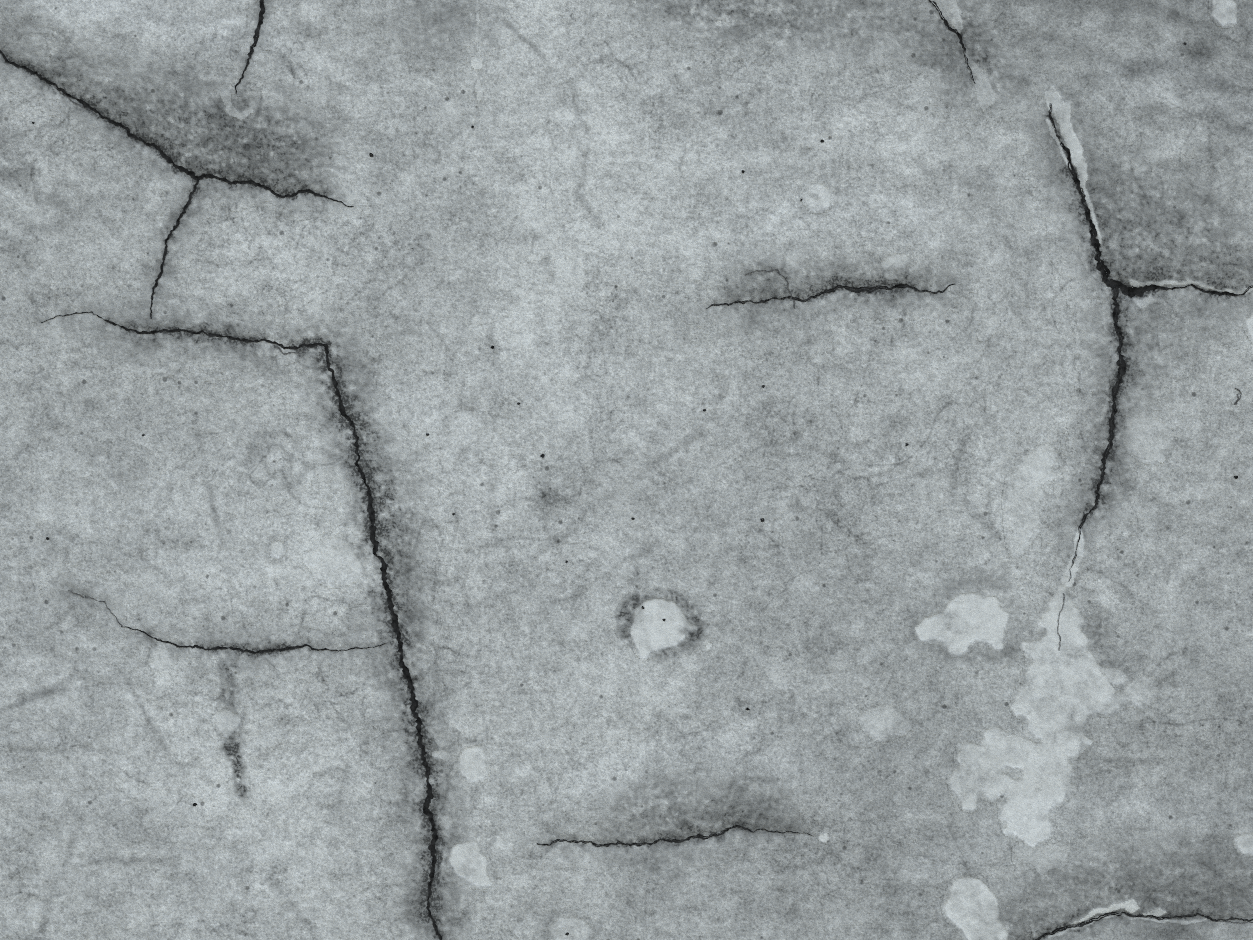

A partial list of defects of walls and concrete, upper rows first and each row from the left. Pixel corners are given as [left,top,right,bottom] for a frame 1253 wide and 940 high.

crack [678,243,979,335]
crack [911,0,1253,651]
crack [0,0,829,940]
spalling [627,593,697,660]
spalling [912,578,1160,875]
spalling [940,872,1012,940]
crack [1011,886,1253,940]